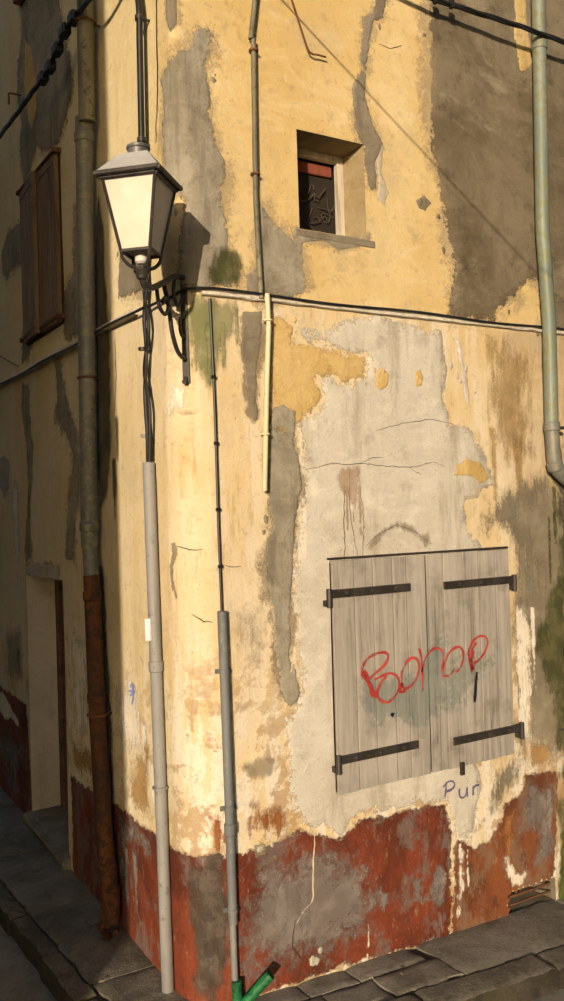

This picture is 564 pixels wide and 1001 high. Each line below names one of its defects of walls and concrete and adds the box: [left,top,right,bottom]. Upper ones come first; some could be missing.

peeling [17,39,37,130]
peeling [416,0,541,322]
peeling [546,0,564,331]
damp [205,307,238,385]
peeling [264,314,389,435]
peeling [415,370,423,387]
peeling [454,459,497,483]
damp [486,342,564,756]
damp [491,765,518,808]
damp [505,855,526,886]